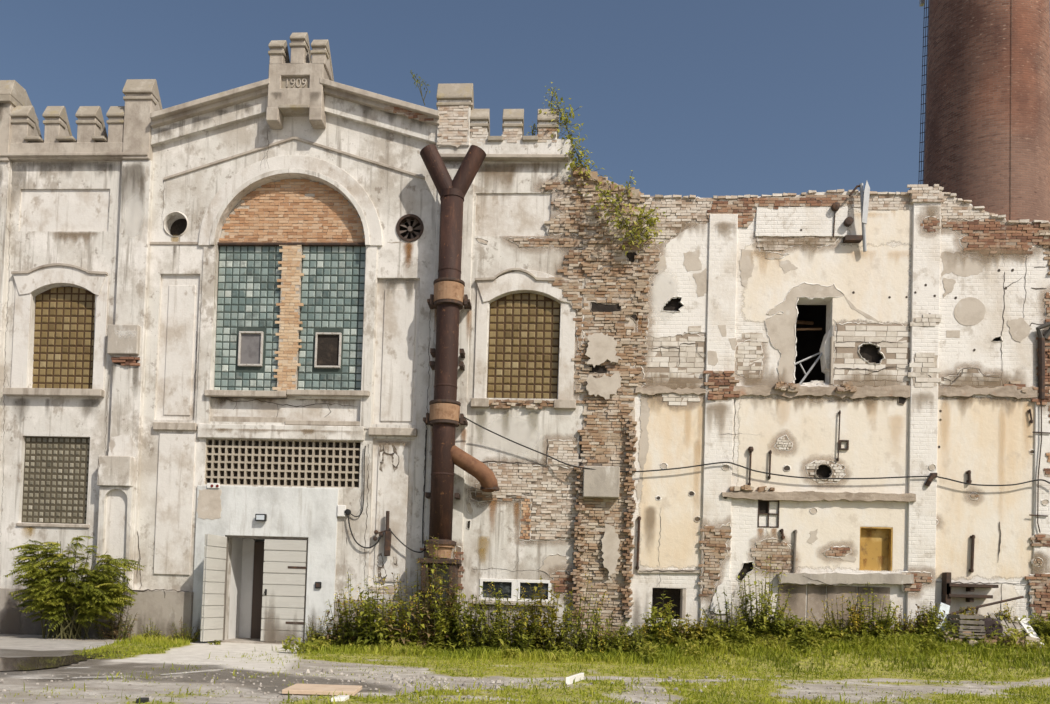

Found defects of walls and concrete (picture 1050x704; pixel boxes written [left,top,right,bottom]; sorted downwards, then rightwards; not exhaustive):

flaking render [504,176,1050,500]
crack [835,258,1048,383]
flaking render [967,490,981,502]
flaking render [694,516,732,600]
flaking render [736,536,798,582]
flaking render [807,529,856,562]
flaking render [1025,533,1050,621]